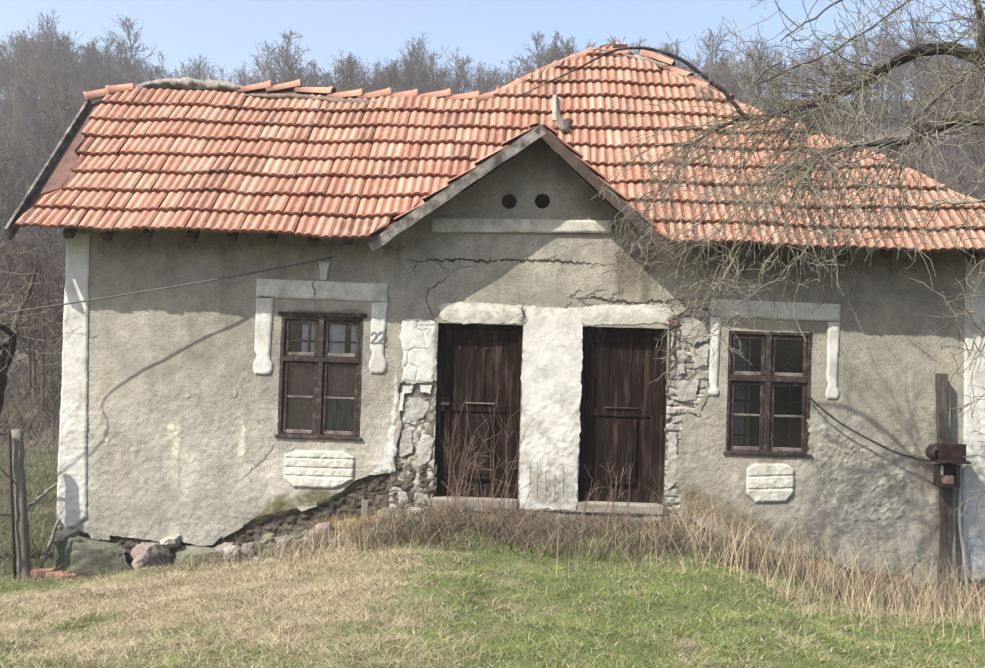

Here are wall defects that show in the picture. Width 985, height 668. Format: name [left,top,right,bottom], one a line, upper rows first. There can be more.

crack [395,252,612,323]
crack [565,289,711,419]
crack [237,443,276,482]
spalling [163,318,437,565]
spalling [661,306,935,595]
spalling [79,531,152,571]